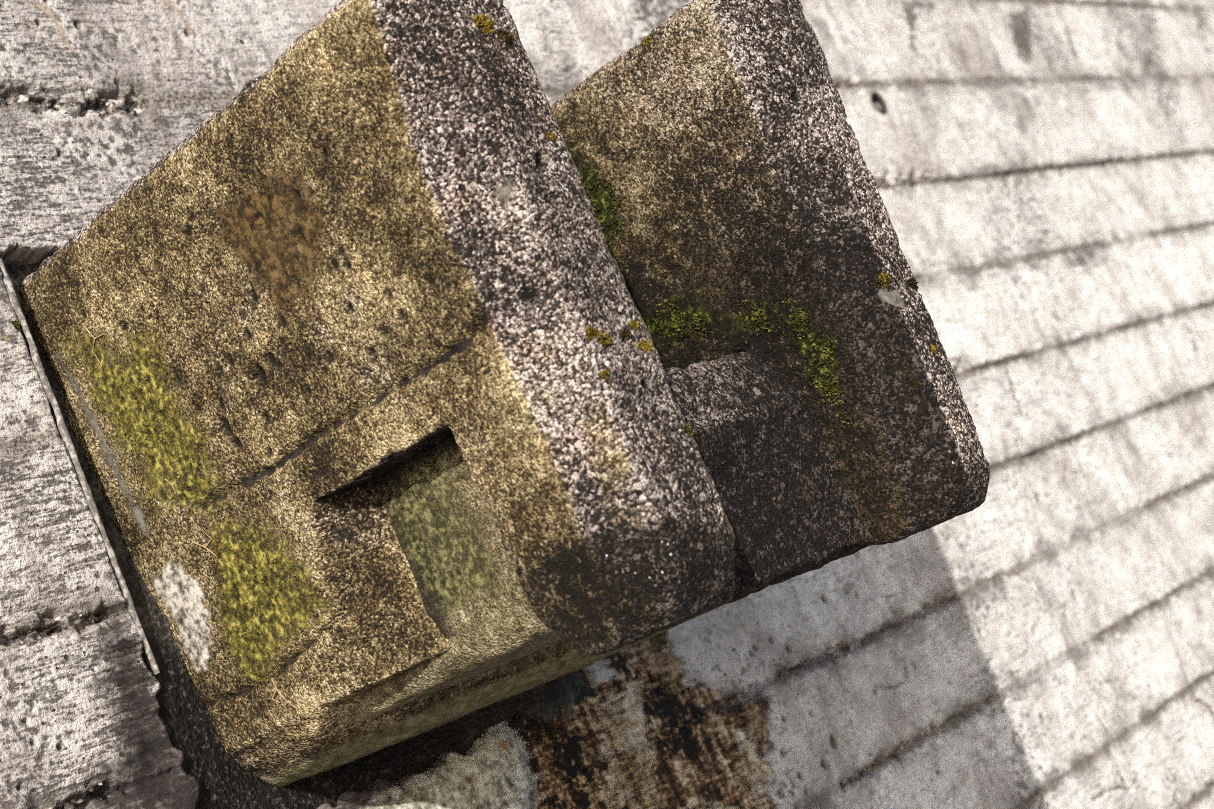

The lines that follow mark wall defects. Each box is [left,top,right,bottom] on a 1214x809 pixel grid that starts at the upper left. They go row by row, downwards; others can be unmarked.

water stain [57,356,146,531]
water stain [154,563,211,671]
rust [507,631,778,809]